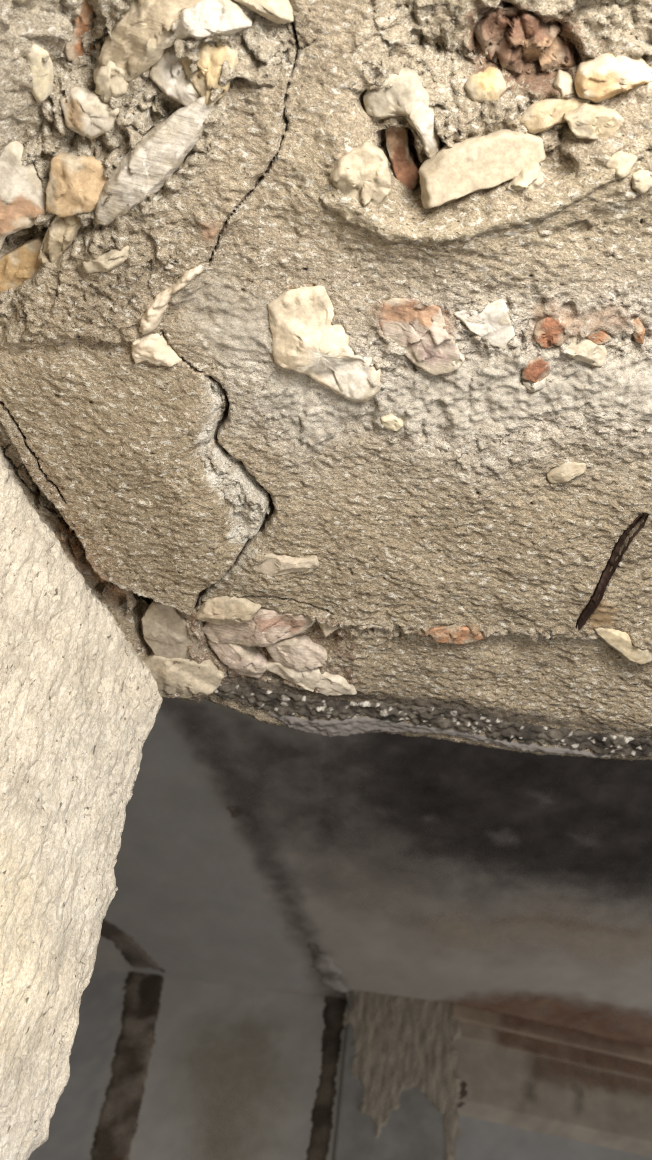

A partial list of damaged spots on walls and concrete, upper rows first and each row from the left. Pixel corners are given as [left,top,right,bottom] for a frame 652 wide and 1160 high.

spalling [21,0,184,194]
spalling [170,3,283,138]
crack [208,21,315,266]
spalling [367,115,428,168]
spalling [371,0,652,148]
corrosion [470,3,578,94]
crack [0,401,75,535]
crack [162,332,275,561]
crack [132,592,151,607]
corrosion [576,513,648,630]
spalling [167,608,652,758]
peeling [306,943,468,1160]